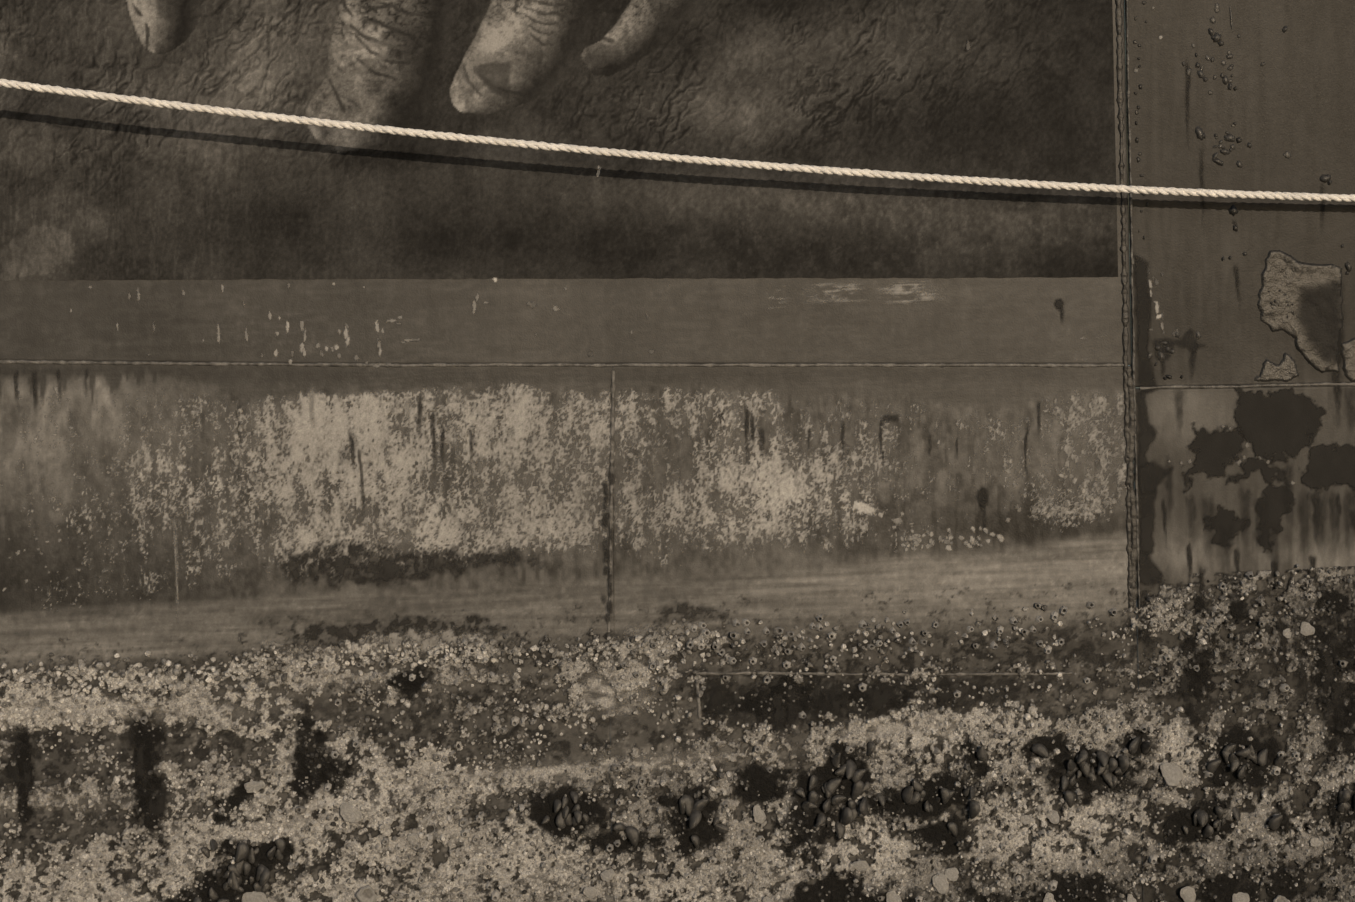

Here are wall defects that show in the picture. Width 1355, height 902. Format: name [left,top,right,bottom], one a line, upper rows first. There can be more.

peeling [1254,250,1355,382]